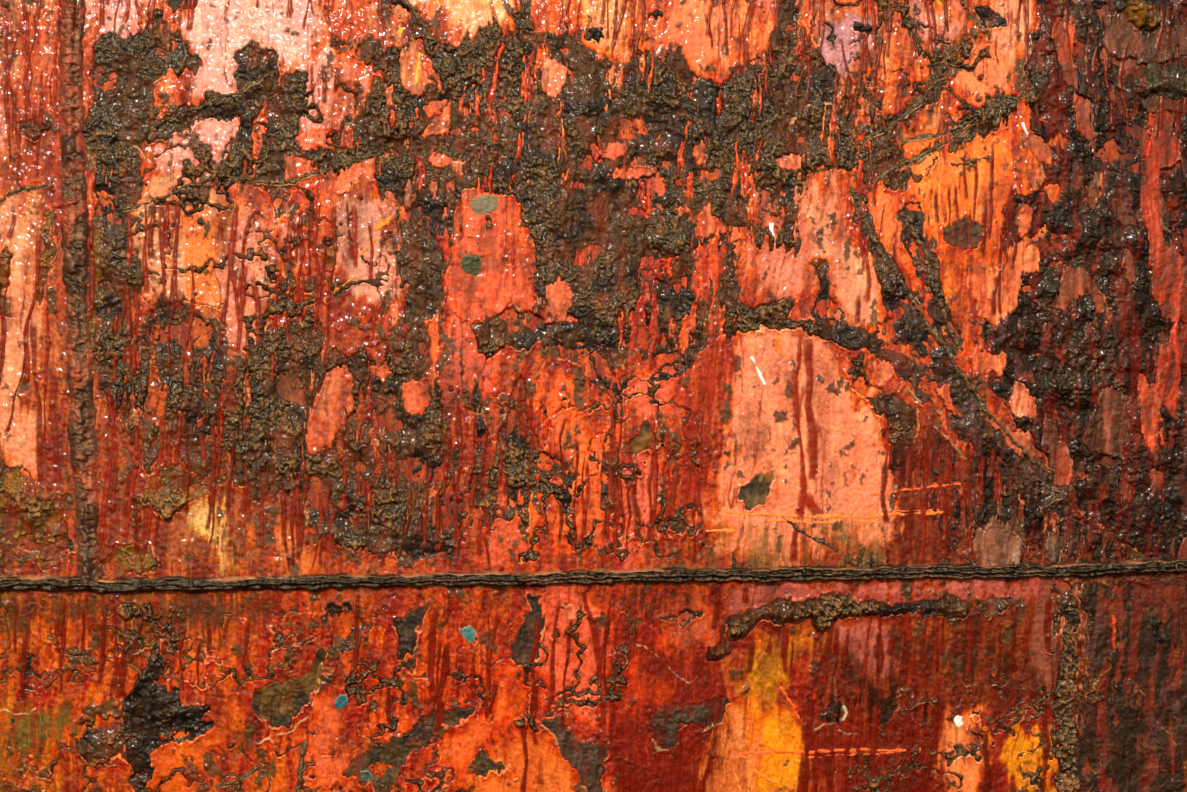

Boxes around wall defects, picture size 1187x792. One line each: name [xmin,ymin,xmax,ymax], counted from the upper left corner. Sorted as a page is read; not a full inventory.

corrosion [4,0,61,188]
corrosion [81,0,1187,579]
corrosion [0,208,75,570]
peeling [563,603,577,623]
peeling [458,625,476,643]
corrosion [0,573,1187,792]
peeling [256,653,328,745]
peeling [334,694,348,710]
peeling [651,722,714,753]
peeling [813,722,857,736]
peeling [360,768,375,782]